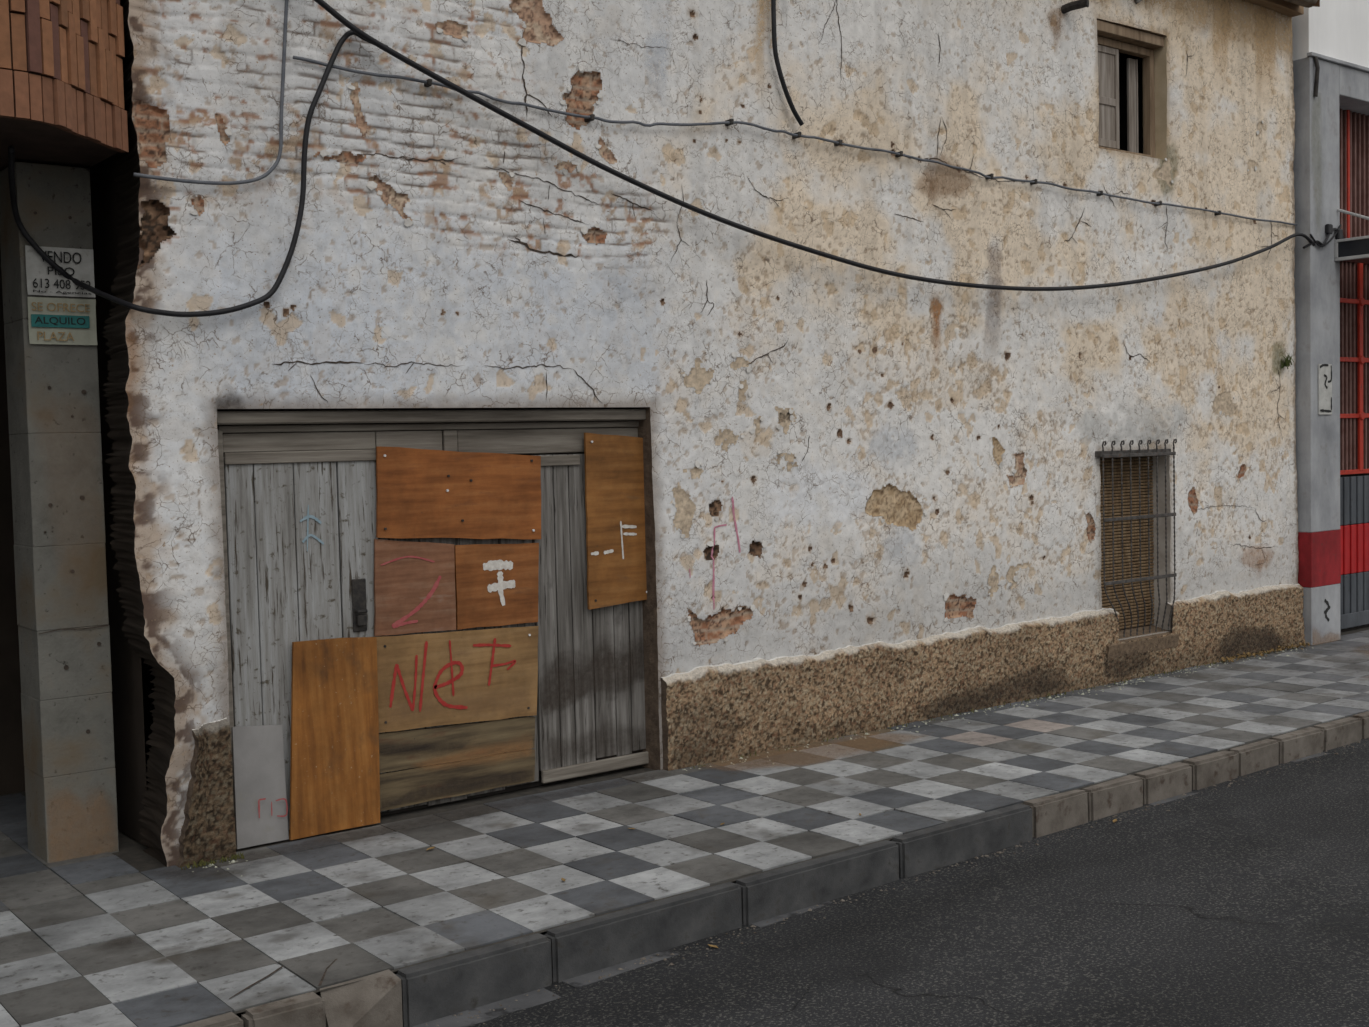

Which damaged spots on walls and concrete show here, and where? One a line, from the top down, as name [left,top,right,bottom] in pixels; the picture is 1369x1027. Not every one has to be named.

spalling [509,0,564,46]
crack [819,0,842,74]
spalling [132,100,170,168]
spalling [560,66,617,164]
spalling [137,199,177,269]
spalling [366,175,413,227]
crack [275,361,454,402]
crack [490,364,602,403]
spalling [977,425,1034,504]
spalling [865,483,939,531]
spalling [687,597,755,647]
spalling [943,556,1045,622]